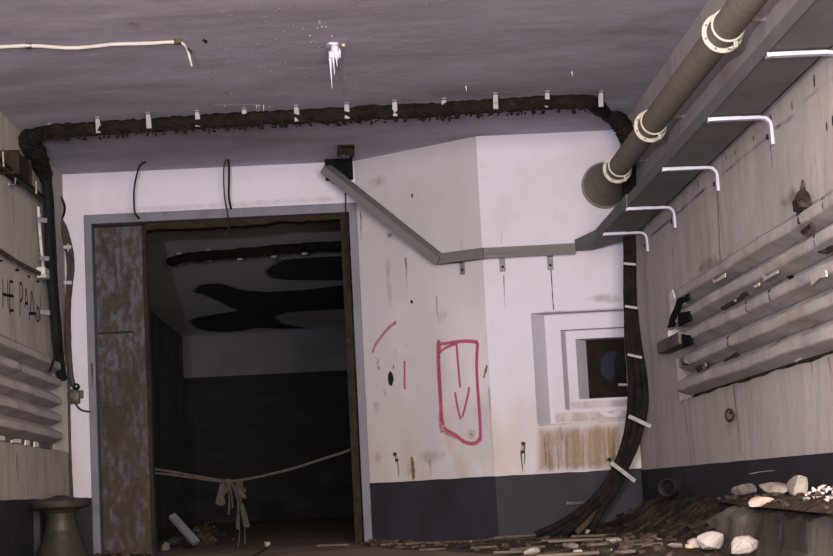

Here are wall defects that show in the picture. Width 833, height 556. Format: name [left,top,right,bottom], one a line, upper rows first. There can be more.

rust [542,428,617,467]